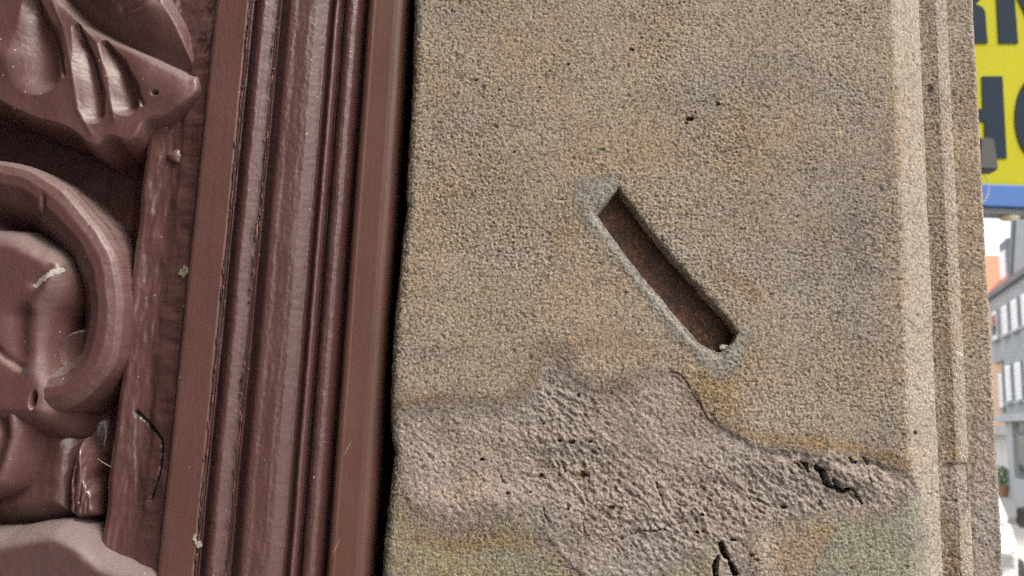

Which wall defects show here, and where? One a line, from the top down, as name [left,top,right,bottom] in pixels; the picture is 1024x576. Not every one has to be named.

spalling [391,340,918,576]
crack [798,461,860,501]